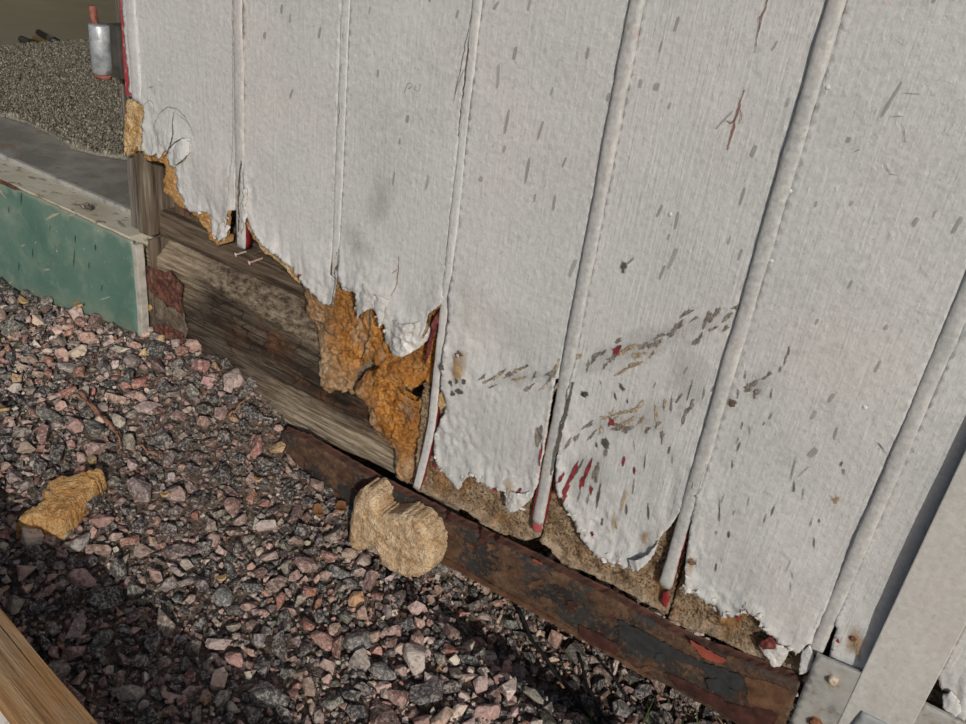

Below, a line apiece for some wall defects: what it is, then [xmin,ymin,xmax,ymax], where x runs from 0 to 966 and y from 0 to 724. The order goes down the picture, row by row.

crack [755,0,768,52]
crack [727,90,745,150]
peeling [212,188,248,241]
peeling [145,265,188,345]
peeling [340,283,431,357]
peeling [434,452,483,487]
peeling [491,487,531,512]
peeling [593,541,659,571]
rust [439,557,653,679]
peeling [712,598,814,675]
rust [667,673,790,724]